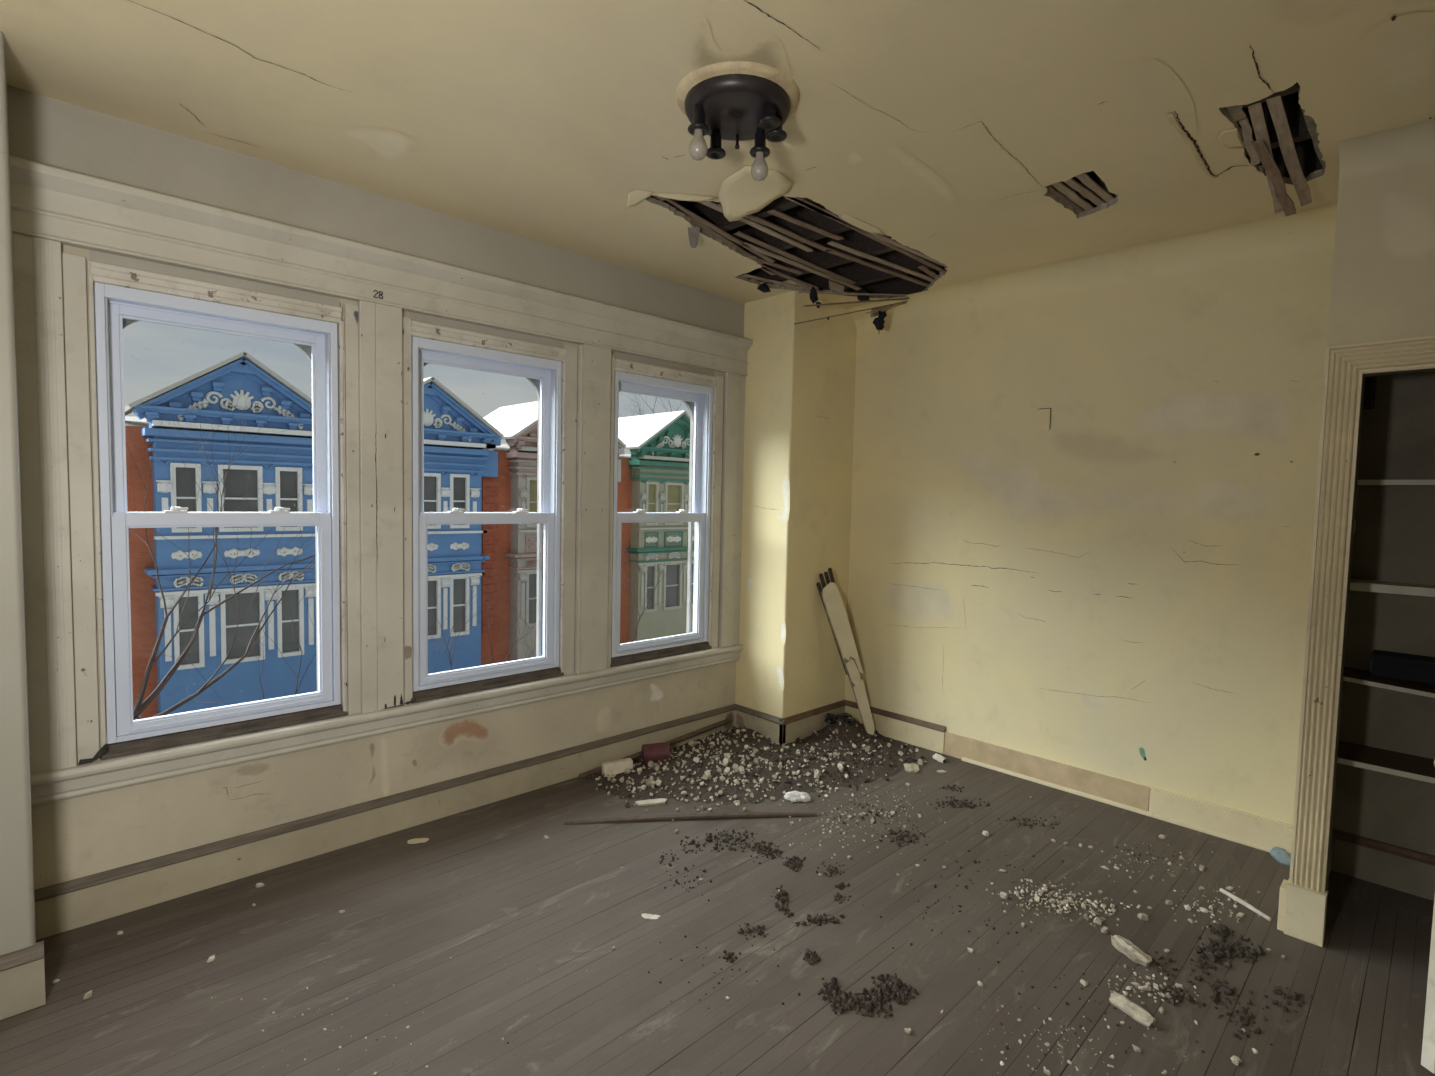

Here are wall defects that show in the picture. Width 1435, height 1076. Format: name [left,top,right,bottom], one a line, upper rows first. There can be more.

crack [744,0,820,50]
crack [1250,46,1271,90]
crack [1166,111,1248,179]
peeling [1217,128,1245,149]
peeling [625,166,794,222]
peeling [841,214,885,235]